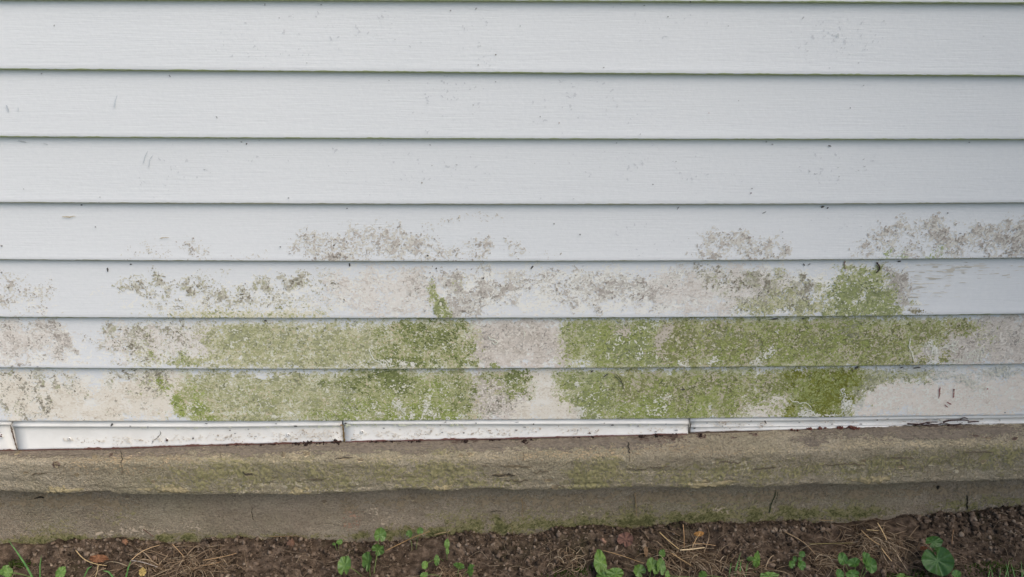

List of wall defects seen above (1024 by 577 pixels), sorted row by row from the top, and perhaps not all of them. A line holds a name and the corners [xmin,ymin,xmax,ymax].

mould [0,211,866,421]
water stain [839,211,1024,315]